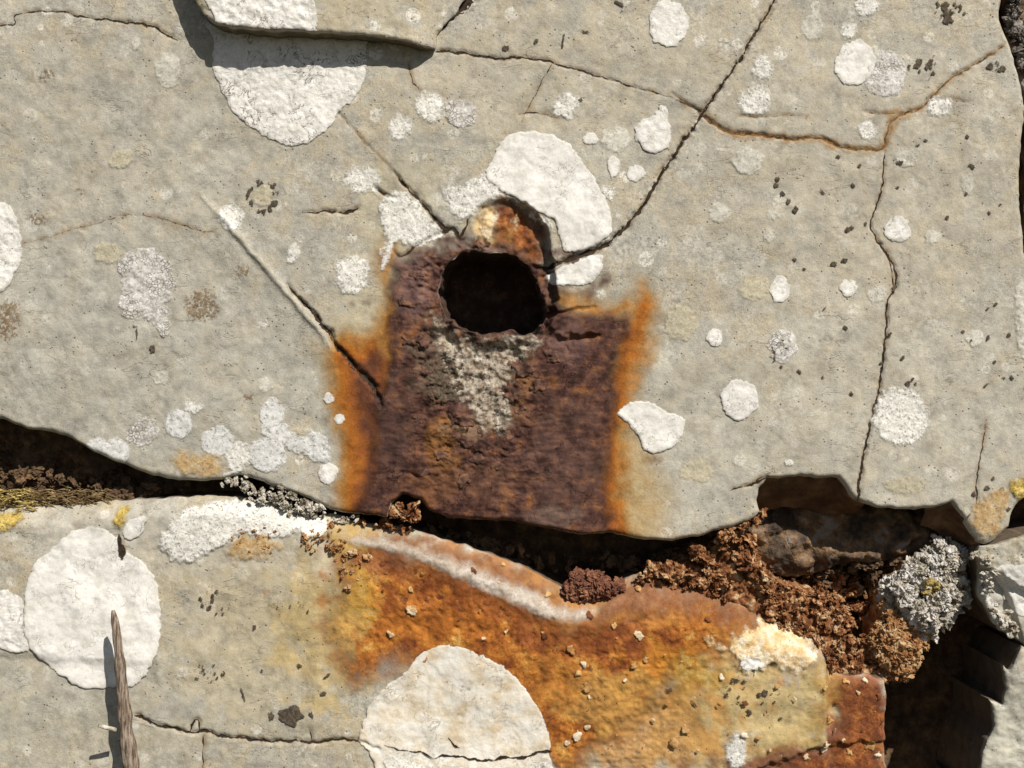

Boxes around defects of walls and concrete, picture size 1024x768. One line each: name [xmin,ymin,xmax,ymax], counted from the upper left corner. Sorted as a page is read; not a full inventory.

crack [304,207,358,215]
crack [376,162,469,257]
crack [435,0,1003,505]
crack [288,285,379,398]
corrosion [328,204,656,538]
spalling [756,476,864,516]
spalling [920,502,980,545]
corrosion [327,528,764,768]
spalling [705,617,817,675]
corrosion [771,677,886,768]